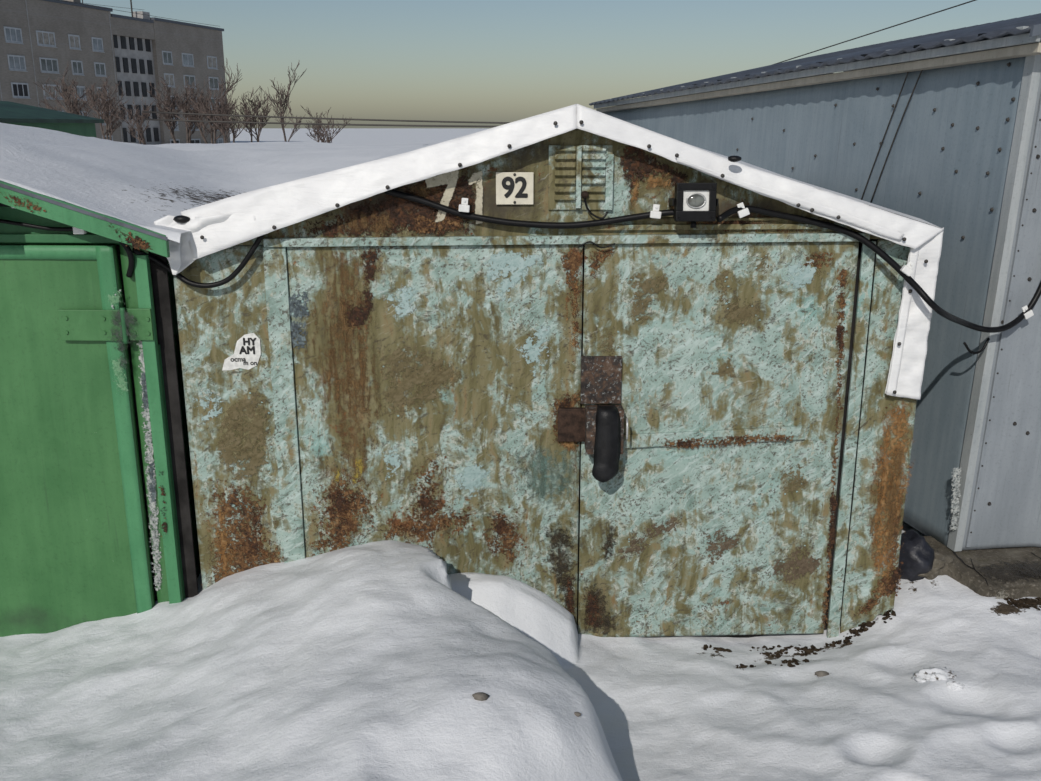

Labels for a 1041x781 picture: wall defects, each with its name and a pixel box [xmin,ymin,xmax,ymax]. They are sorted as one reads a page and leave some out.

rust [619,145,689,209]
peeling [289,291,310,350]
rust [296,167,528,569]
peeling [484,248,544,302]
peeling [514,320,551,377]
peeling [626,272,676,325]
peeling [755,255,817,291]
rust [664,433,793,450]
rust [803,250,849,629]
rust [196,477,284,587]
peeling [697,526,746,572]
rust [854,401,912,618]